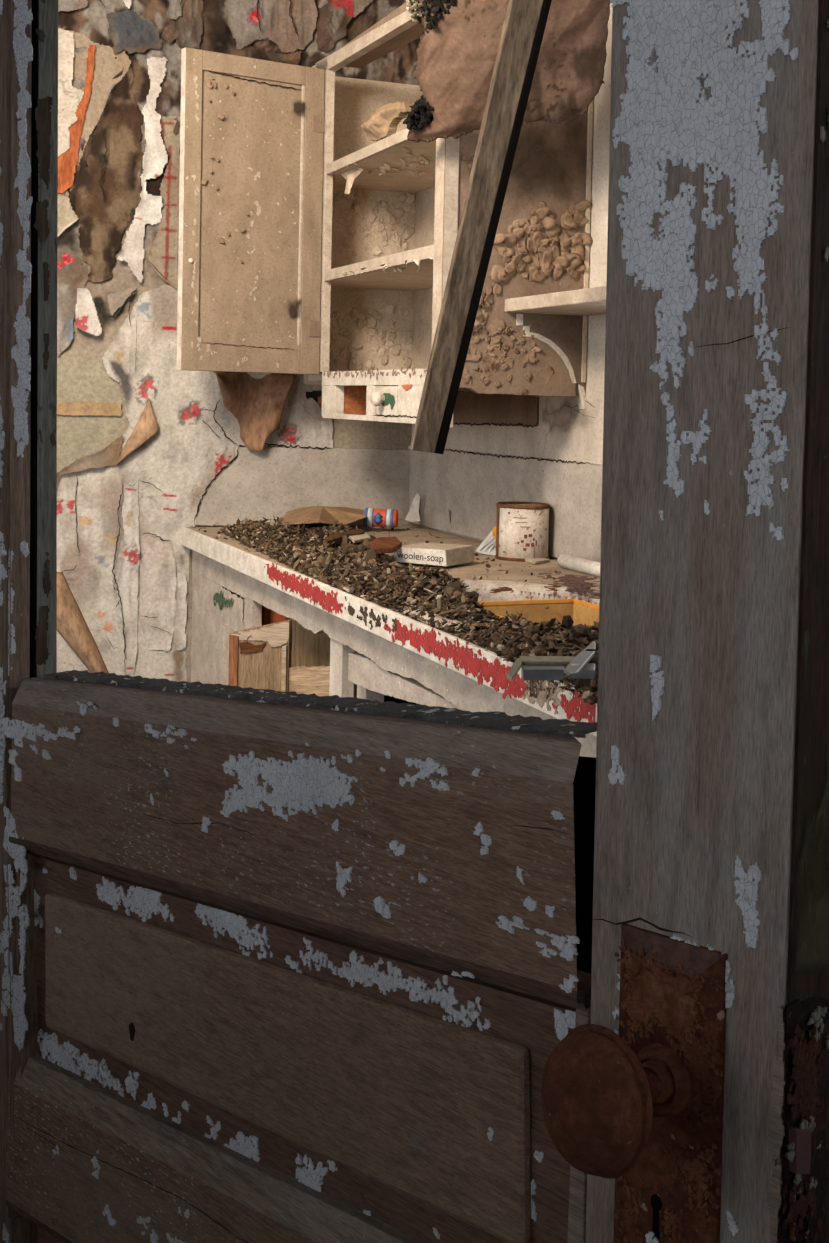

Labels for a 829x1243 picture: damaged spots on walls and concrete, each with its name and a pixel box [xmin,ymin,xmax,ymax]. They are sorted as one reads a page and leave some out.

leakage [205,0,231,45]
peeling [0,0,78,487]
peeling [610,0,799,540]
crack [61,475,80,572]
crack [97,478,170,674]
peeling [0,531,197,1124]
peeling [201,742,362,833]
peeling [380,750,450,791]
peeling [194,903,491,1031]
peeling [496,866,580,993]
peeling [554,1008,576,1041]
peeling [205,1115,261,1162]